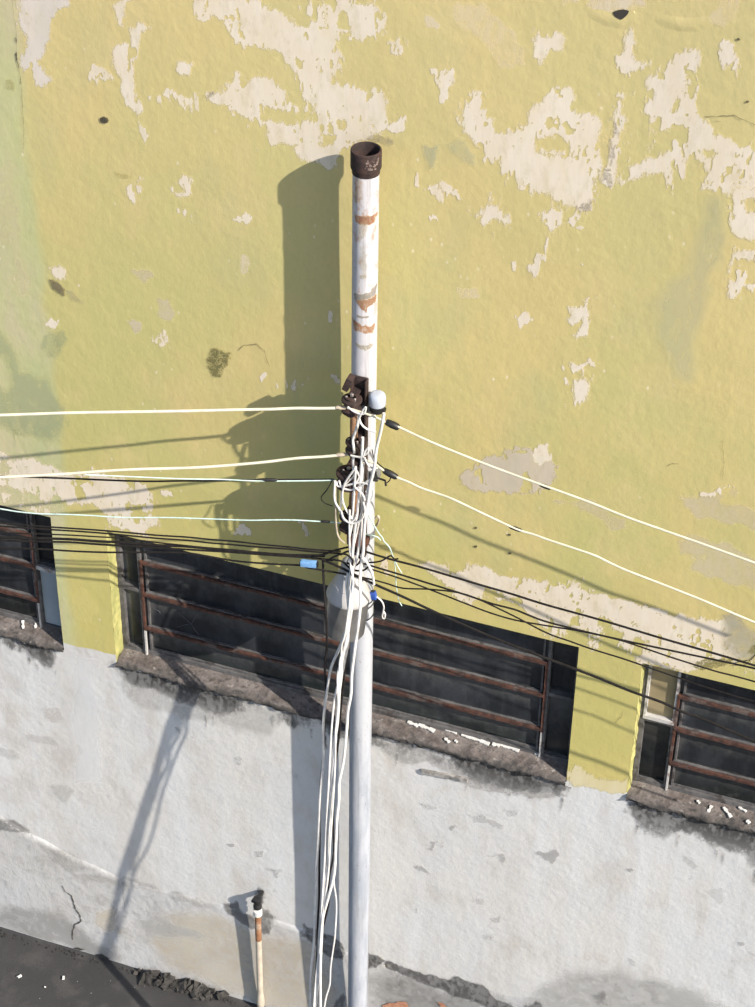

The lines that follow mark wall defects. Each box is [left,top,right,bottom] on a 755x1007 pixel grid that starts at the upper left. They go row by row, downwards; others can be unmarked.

peeling [16,0,70,87]
peeling [88,0,408,170]
peeling [455,9,755,299]
peeling [0,450,173,541]
peeling [459,443,559,495]
peeling [410,545,755,674]
damp [119,667,254,722]
damp [280,711,349,747]
damp [371,735,572,807]
damp [628,802,755,876]
crack [62,886,82,940]
damp [142,888,345,1007]